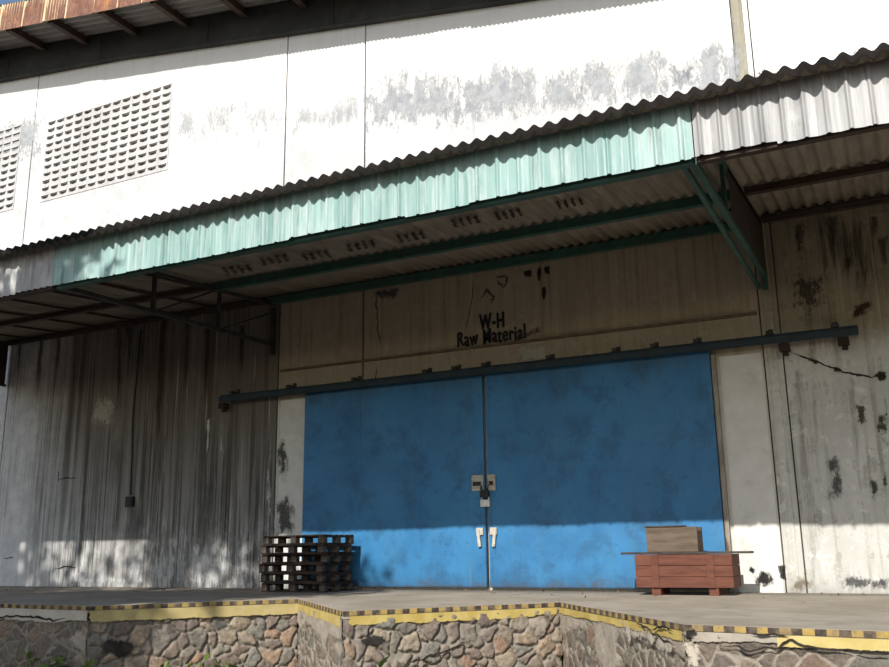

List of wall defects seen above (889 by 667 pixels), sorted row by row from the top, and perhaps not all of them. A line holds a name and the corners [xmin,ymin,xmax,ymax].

damp [820,217,887,278]
damp [786,223,826,315]
damp [856,405,866,424]
damp [877,413,887,434]
damp [270,442,288,473]
damp [828,456,842,498]
damp [267,471,294,536]
damp [749,565,809,588]
damp [844,577,888,588]